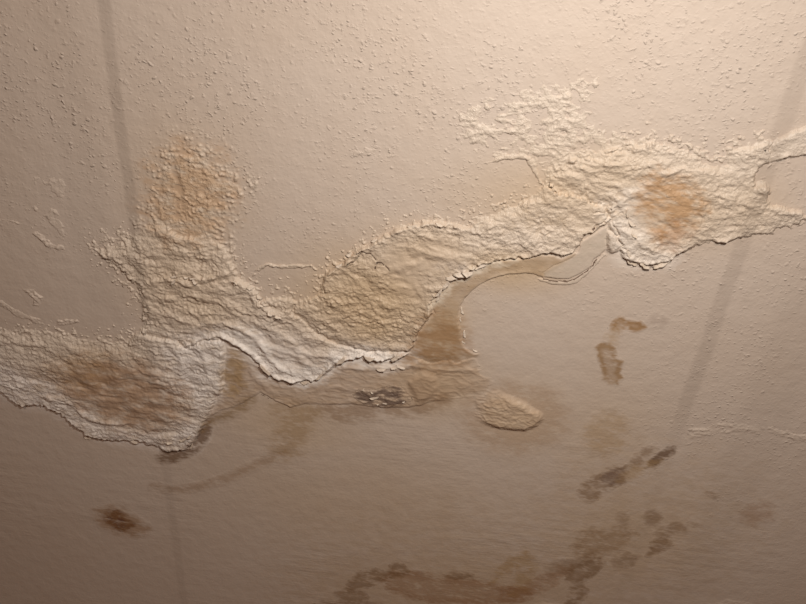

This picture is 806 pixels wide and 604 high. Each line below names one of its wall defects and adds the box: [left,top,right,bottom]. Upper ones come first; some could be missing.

crack [543,255,600,282]
water stain [589,177,694,277]
flaking render [351,384,411,405]
water stain [0,251,806,604]